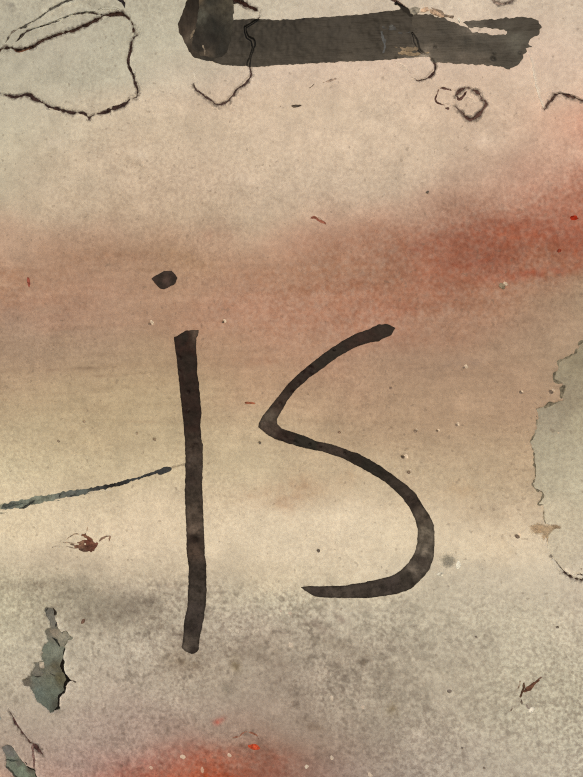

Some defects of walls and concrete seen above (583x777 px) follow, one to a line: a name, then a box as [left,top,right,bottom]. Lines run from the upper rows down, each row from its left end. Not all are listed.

crack [492,0,514,8]
crack [0,0,139,121]
crack [192,67,252,106]
crack [395,62,488,122]
crack [527,50,583,110]
peeling [530,340,583,575]
peeling [22,607,78,716]
peeling [0,745,49,777]